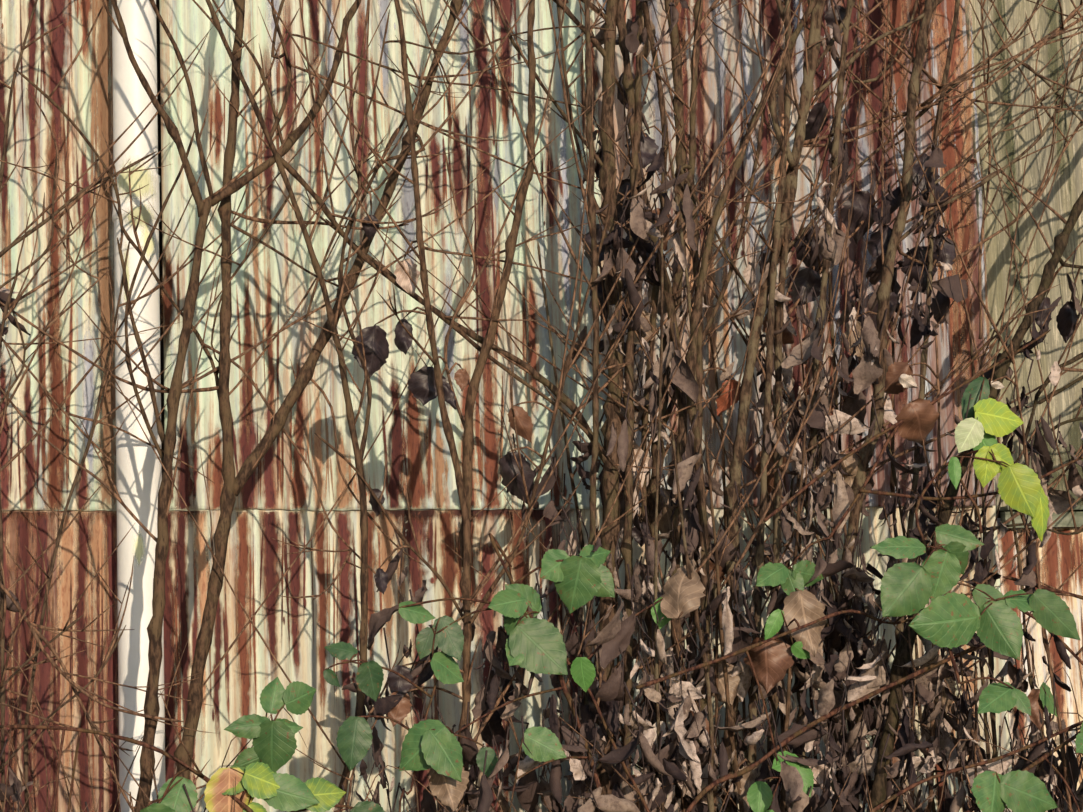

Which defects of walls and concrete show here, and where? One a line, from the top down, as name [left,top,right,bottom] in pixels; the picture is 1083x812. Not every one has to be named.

corrosion [624,0,636,23]
corrosion [579,21,599,146]
corrosion [674,0,991,446]
corrosion [0,0,120,812]
corrosion [162,0,583,786]
corrosion [998,528,1083,599]
corrosion [1048,634,1069,723]
corrosion [413,768,436,812]
corrosion [486,719,509,812]